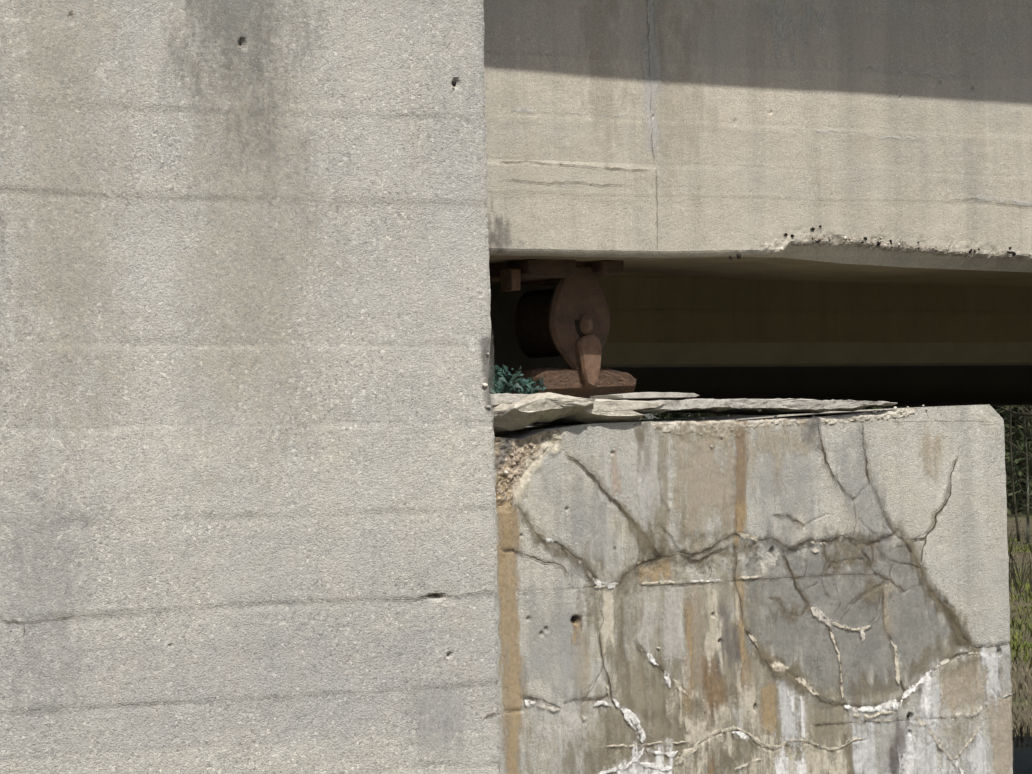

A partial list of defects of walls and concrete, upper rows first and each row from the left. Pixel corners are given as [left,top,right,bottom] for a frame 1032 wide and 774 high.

crack [502,137,658,204]
spalling [760,225,1032,261]
spalling [494,430,562,505]
rust [735,421,746,546]
rust [496,478,526,774]
rust [570,615,582,643]
rust [599,575,615,655]
rust [684,577,751,725]
crack [484,417,1013,774]
water stain [607,530,1001,774]